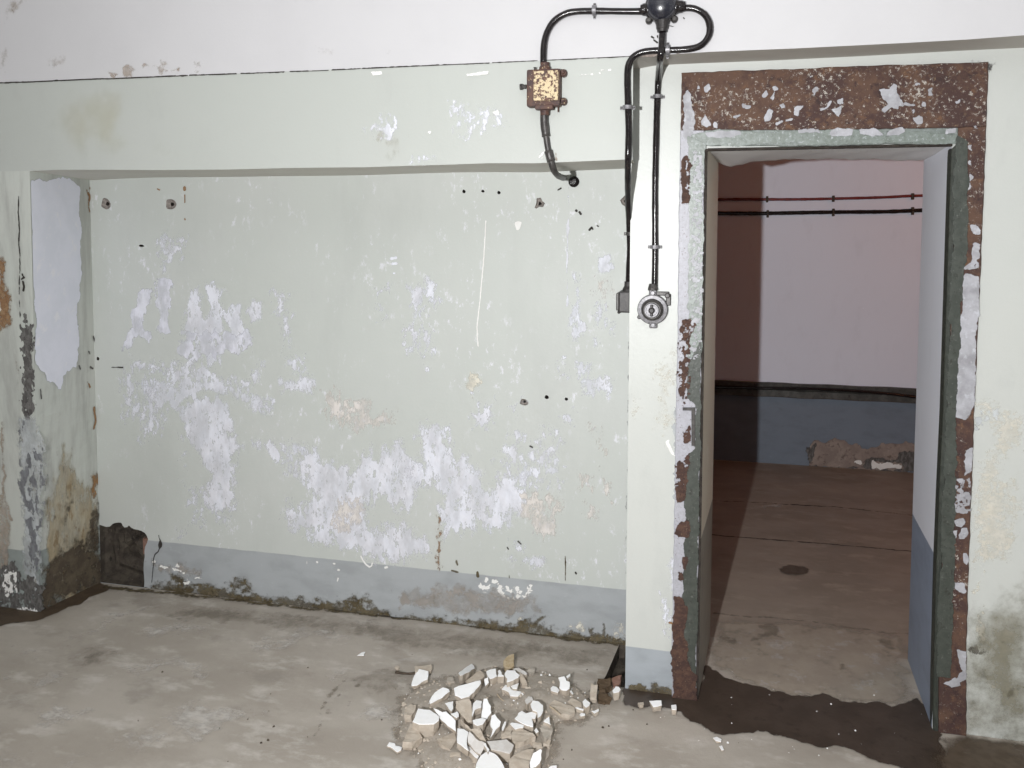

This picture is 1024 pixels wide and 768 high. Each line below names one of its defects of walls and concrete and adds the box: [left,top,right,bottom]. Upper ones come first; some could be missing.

corrosion [680,155,693,204]
corrosion [0,258,13,331]
peeling [118,234,398,528]
corrosion [676,319,696,404]
flaking render [99,522,148,587]
damp [0,313,626,653]
peeling [279,406,574,571]
corrosion [674,426,691,503]
corrosion [674,520,691,538]
peeling [809,438,915,472]
corrosion [669,596,698,701]
damp [968,616,1024,723]